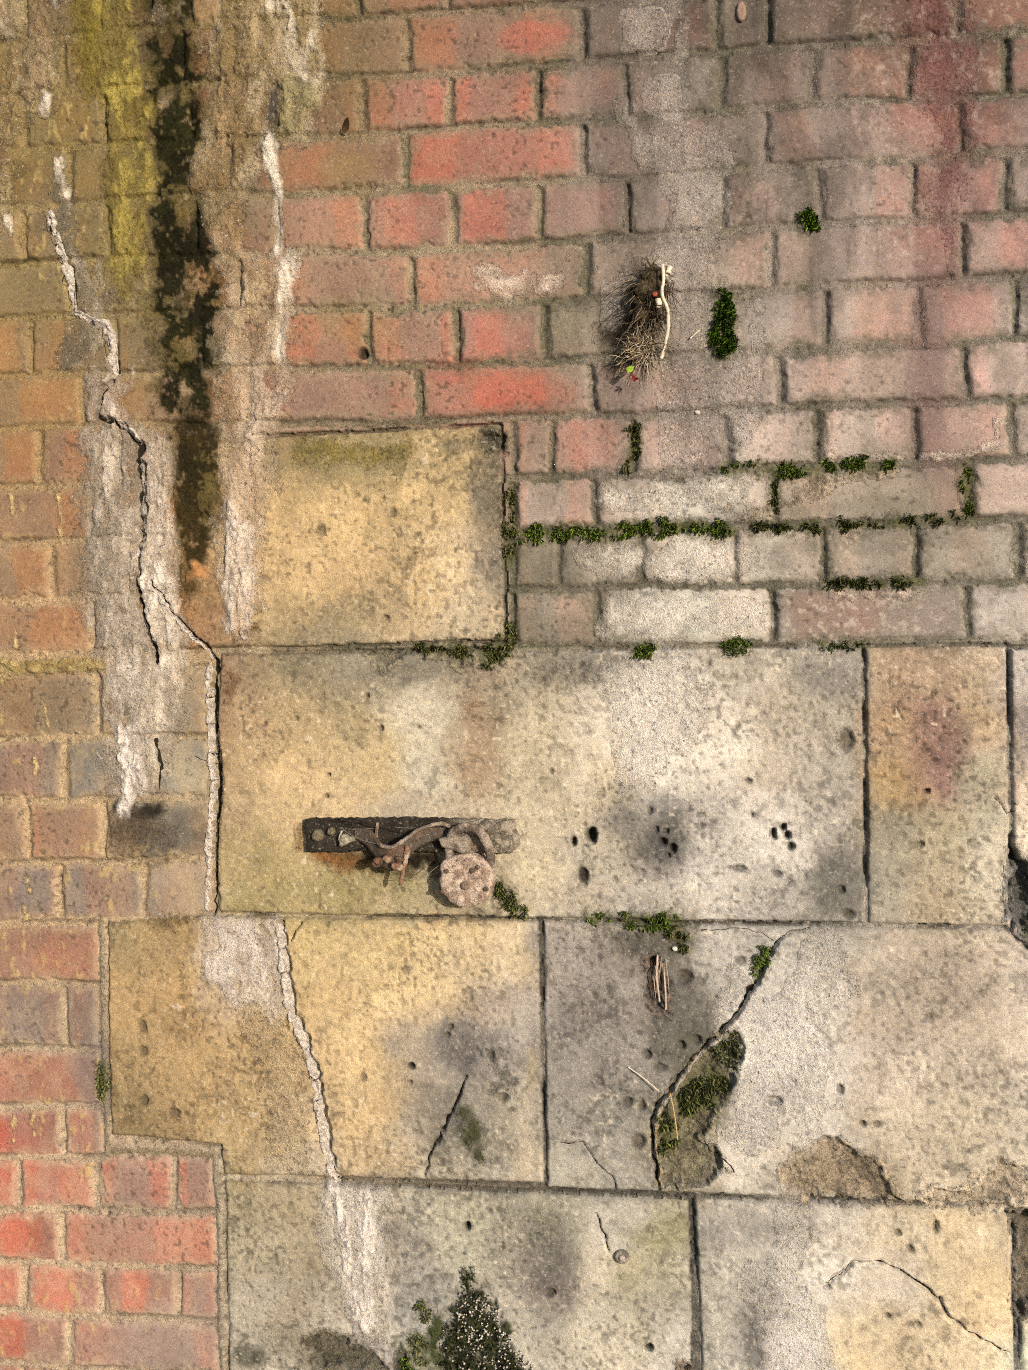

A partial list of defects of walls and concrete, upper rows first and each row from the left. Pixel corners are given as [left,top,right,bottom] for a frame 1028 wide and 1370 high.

water stain [0,0,74,239]
water stain [43,0,337,819]
crack [43,210,224,912]
spalling [836,726,858,755]
spalling [835,884,857,921]
spalling [1001,842,1028,936]
crack [275,922,341,1180]
crack [650,927,809,1186]
spalling [835,1082,845,1096]
spalling [775,1119,1028,1324]
crack [826,1259,1010,1353]